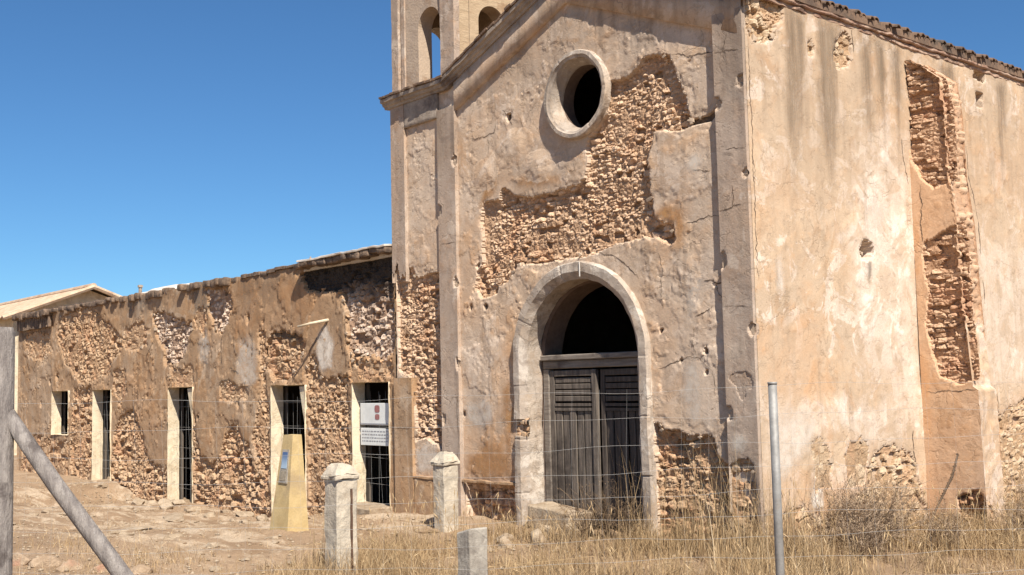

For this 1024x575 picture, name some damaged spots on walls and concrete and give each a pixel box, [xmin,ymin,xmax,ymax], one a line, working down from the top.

flaking render [744,0,781,43]
leakage [818,20,836,142]
flaking render [833,32,853,69]
flaking render [477,54,697,309]
flaking render [906,60,983,384]
flaking render [26,288,233,501]
flaking render [193,257,446,518]
crack [658,279,746,396]
flaking render [657,423,927,546]
flaking render [998,399,1024,508]